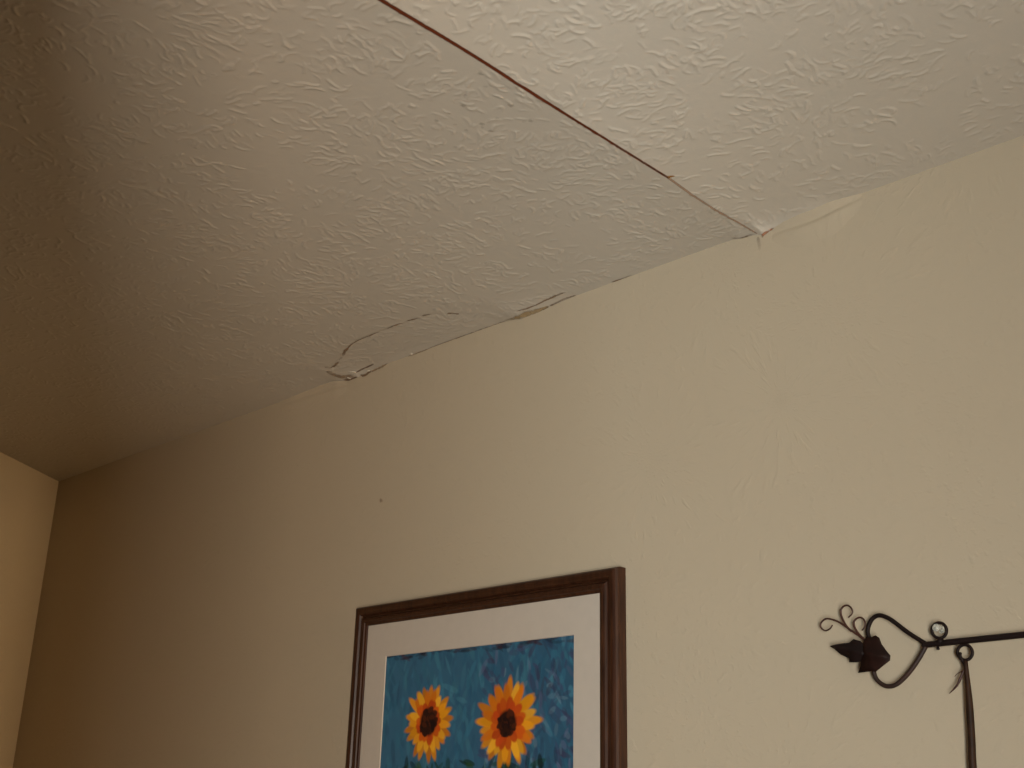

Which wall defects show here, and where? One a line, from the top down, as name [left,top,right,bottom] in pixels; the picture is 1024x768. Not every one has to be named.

crack [379,0,773,238]
peeling [514,293,574,319]